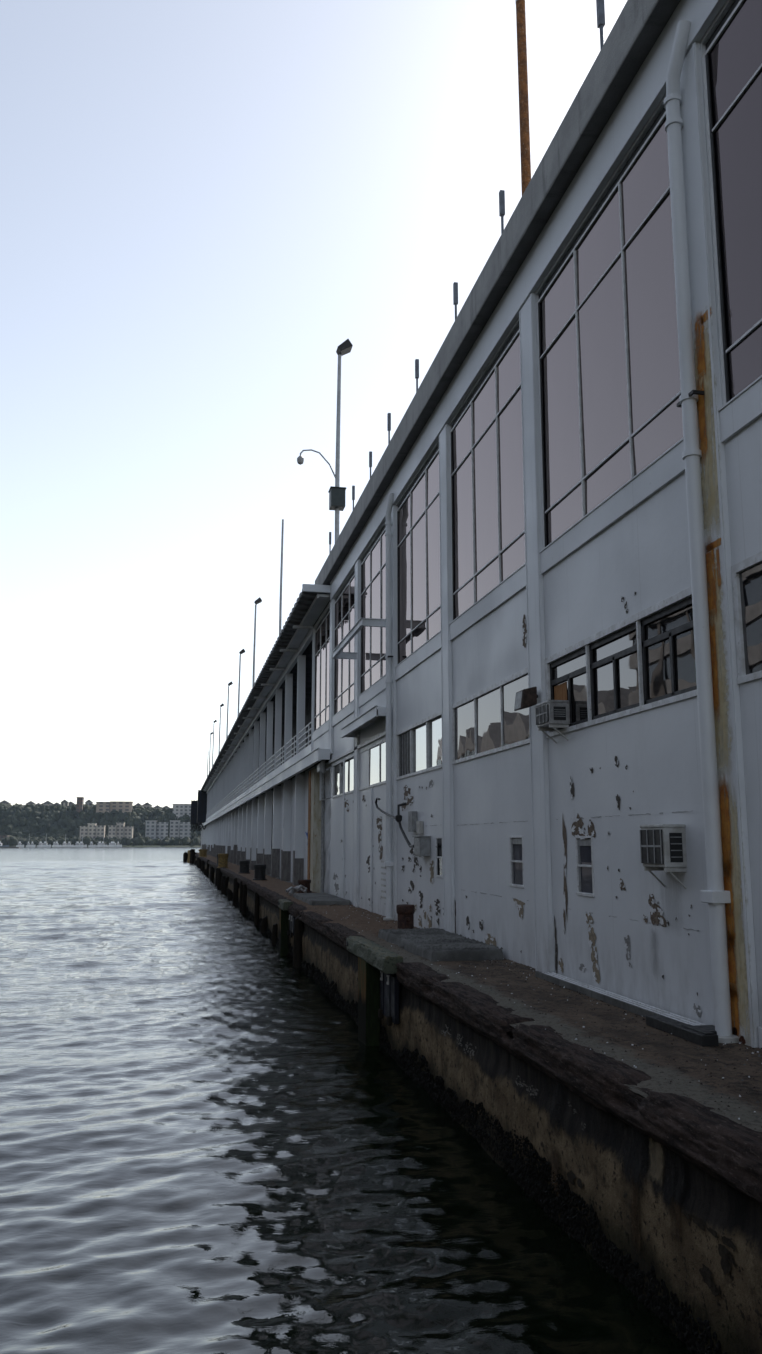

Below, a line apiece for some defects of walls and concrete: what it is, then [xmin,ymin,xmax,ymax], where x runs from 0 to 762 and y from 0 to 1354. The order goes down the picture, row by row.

corrosion [695,308,711,457]
corrosion [705,538,721,711]
peeling [333,763,385,905]
peeling [401,780,434,811]
peeling [401,846,444,928]
peeling [558,911,600,984]
peeling [562,776,610,934]
peeling [643,894,692,927]
corrosion [719,783,746,1044]